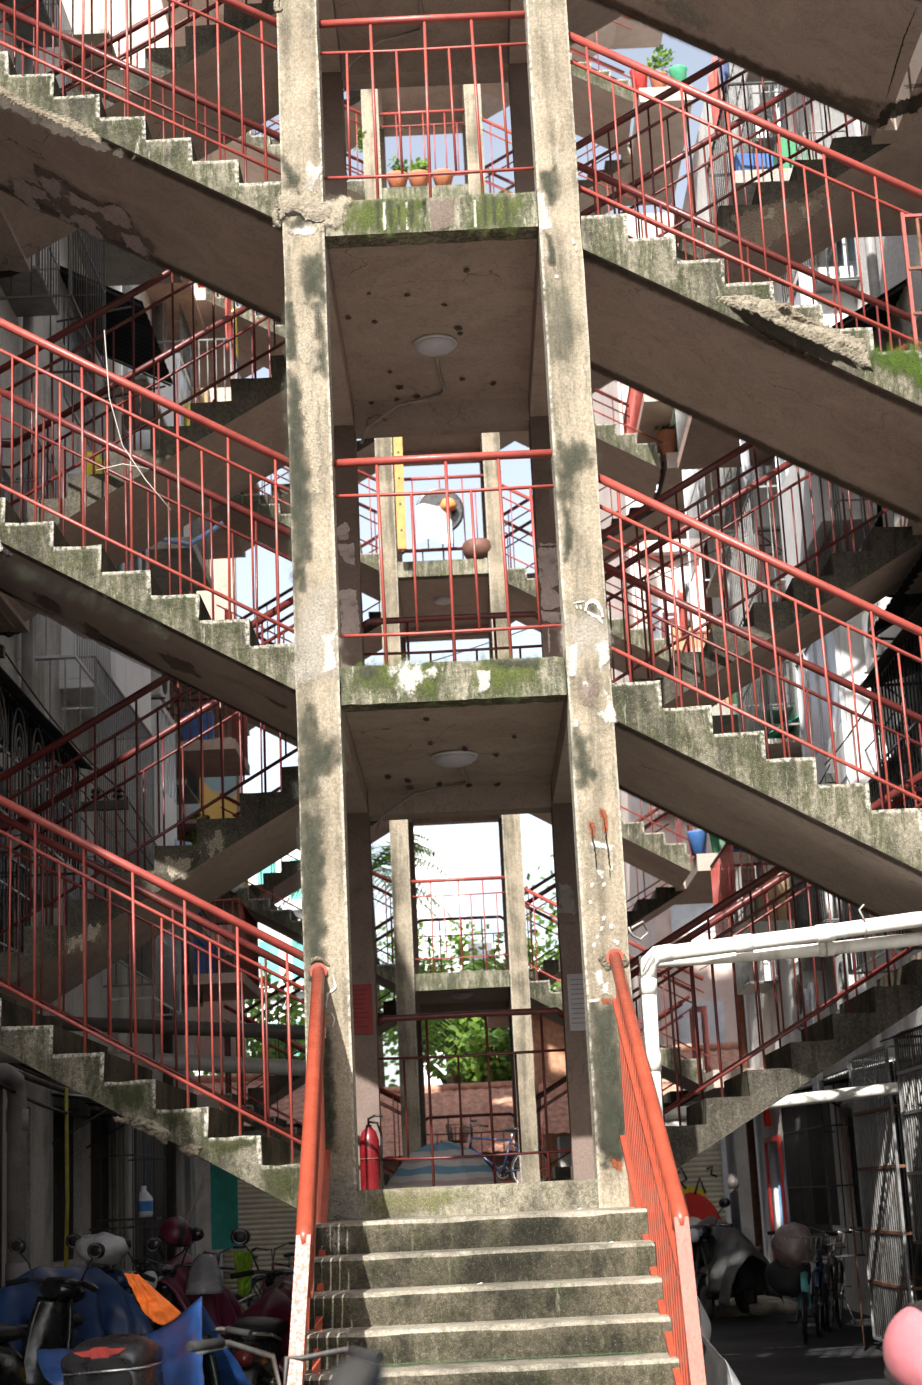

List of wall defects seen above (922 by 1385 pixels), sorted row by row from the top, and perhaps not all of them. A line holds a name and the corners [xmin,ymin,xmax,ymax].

water stain [101,139,305,231]
water stain [541,168,556,204]
peeling [289,225,315,236]
water stain [546,233,555,265]
water stain [584,252,922,415]
spalling [716,294,873,372]
water stain [119,247,326,590]
water stain [590,362,920,522]
peeling [537,543,561,651]
peeling [390,661,437,693]
peeling [477,671,490,691]
peeling [568,641,616,722]